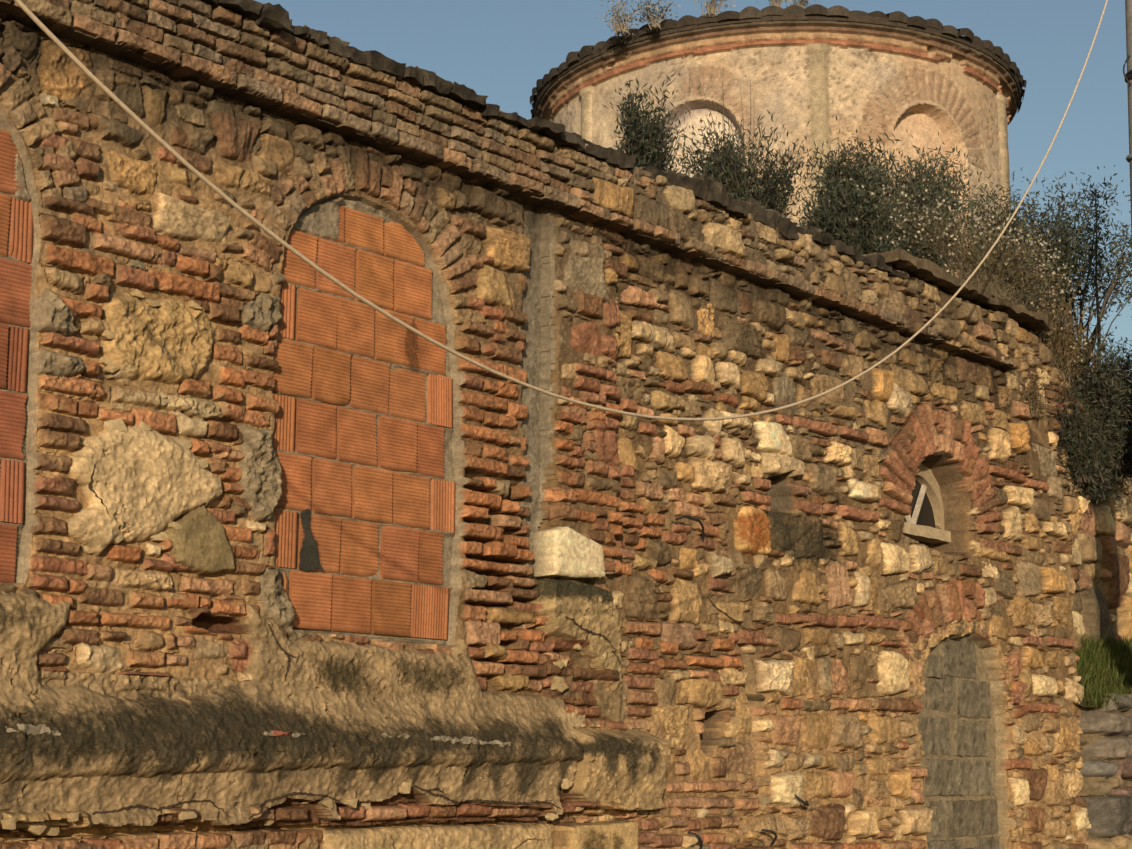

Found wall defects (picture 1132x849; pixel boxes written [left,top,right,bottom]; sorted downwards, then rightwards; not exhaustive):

hole [192,612,253,634]
crack [565,616,620,664]
flaking render [156,808,203,827]